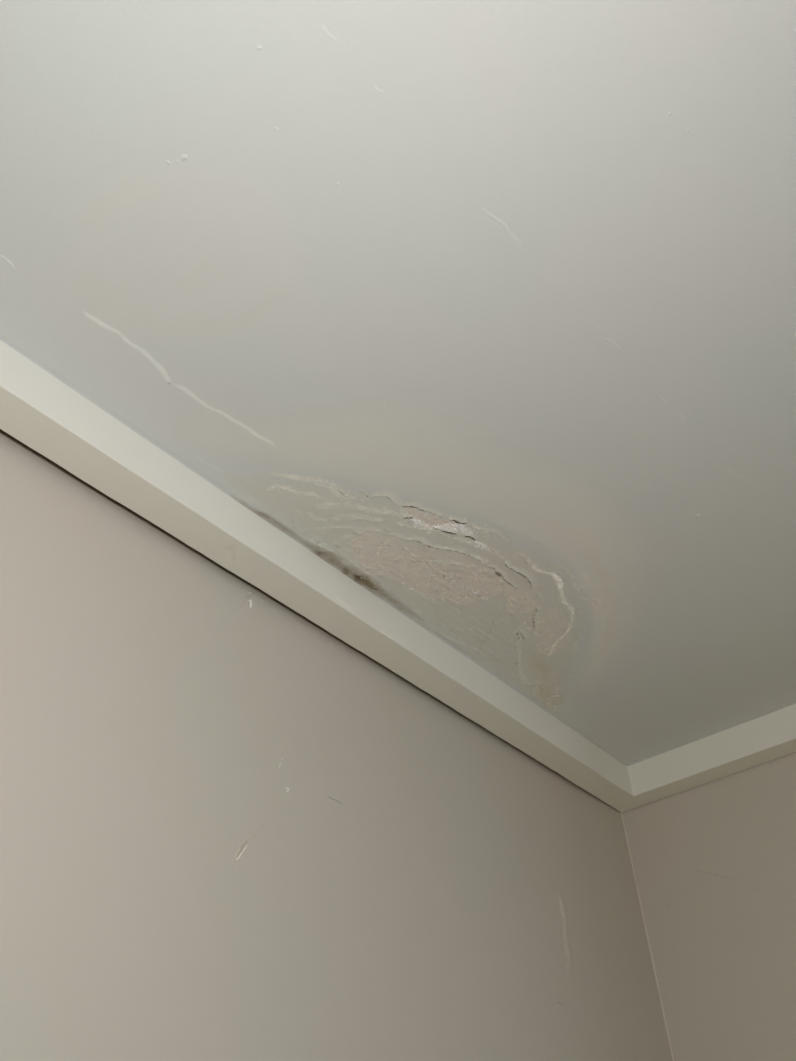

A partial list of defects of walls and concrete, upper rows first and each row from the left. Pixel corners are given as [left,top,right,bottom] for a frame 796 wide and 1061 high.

peeling [220,471,586,714]